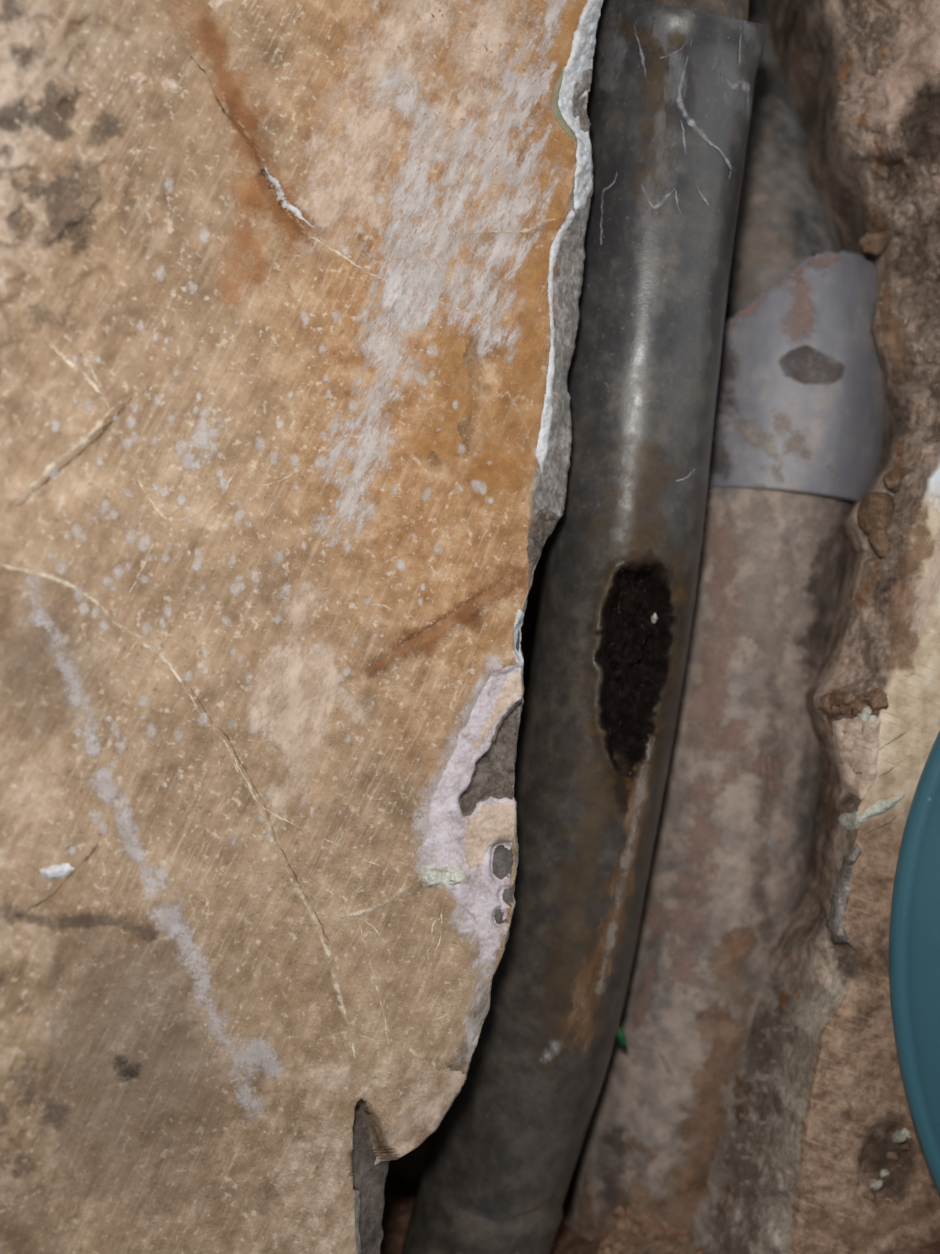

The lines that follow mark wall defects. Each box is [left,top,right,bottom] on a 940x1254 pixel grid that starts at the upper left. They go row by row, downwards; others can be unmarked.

corrosion [194,21,308,302]
crack [191,57,482,323]
water stain [314,0,558,548]
corrosion [550,0,584,66]
spalling [535,0,603,473]
crack [17,346,132,507]
water stain [94,768,166,896]
crack [0,564,420,1117]
water stain [138,906,282,1108]
peeling [351,609,524,1254]
corrosion [369,562,529,673]
spalling [818,687,889,799]